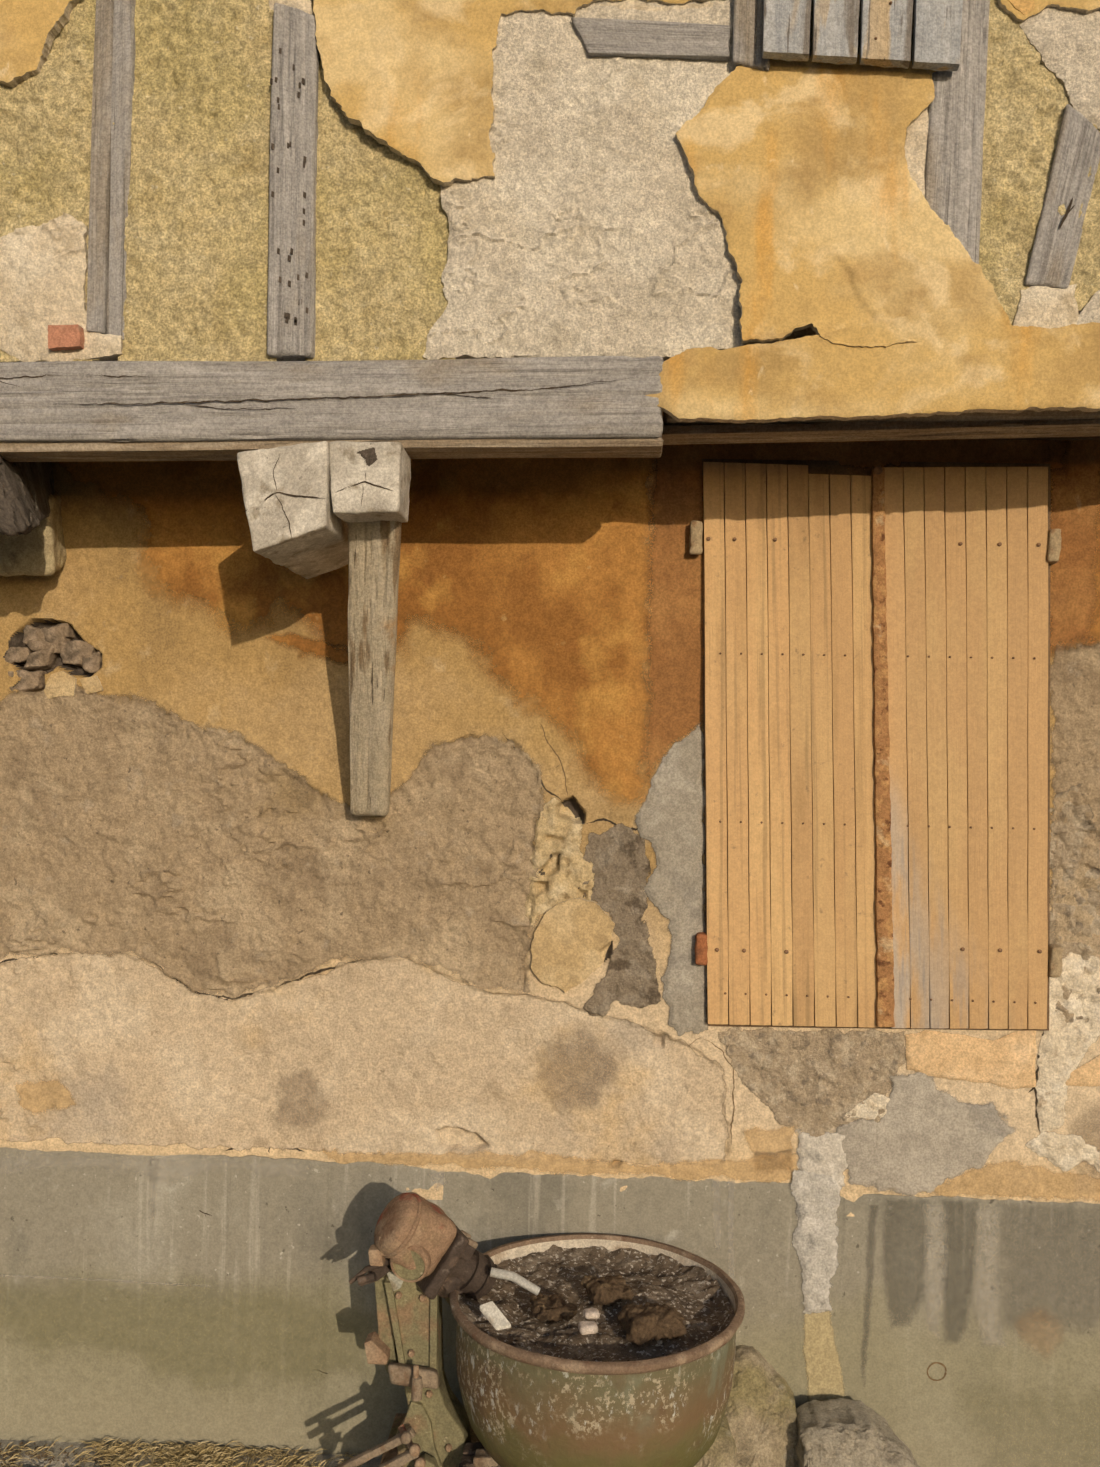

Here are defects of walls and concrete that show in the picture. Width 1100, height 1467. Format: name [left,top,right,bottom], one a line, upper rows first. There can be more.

spalling [270,48,305,110]
spalling [269,0,314,15]
spalling [423,0,1100,361]
spalling [0,213,123,362]
spalling [277,248,309,326]
spalling [0,620,906,1166]
spalling [1026,644,1100,1172]